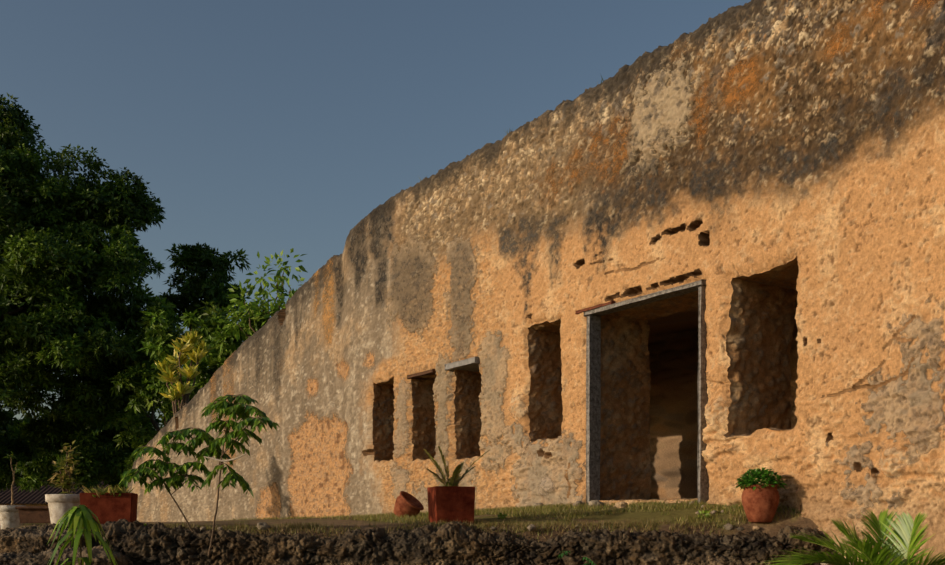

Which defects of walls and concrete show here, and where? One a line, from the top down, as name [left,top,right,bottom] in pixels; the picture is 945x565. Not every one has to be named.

water stain [759,134,849,185]
water stain [587,150,742,261]
water stain [334,201,427,325]
water stain [499,217,566,311]
crack [821,314,916,398]
peeling [887,298,944,359]
peeling [479,422,552,475]
peeling [840,459,903,518]